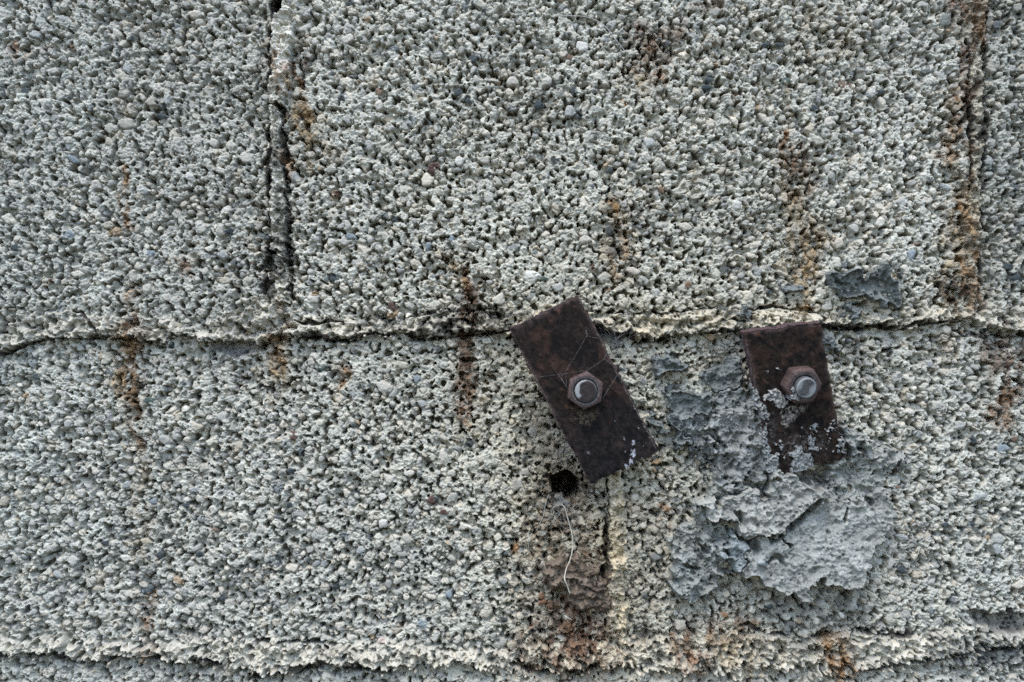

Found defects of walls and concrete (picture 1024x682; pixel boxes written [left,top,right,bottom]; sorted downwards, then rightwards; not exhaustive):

crack [258,0,510,347]
corrosion [942,206,976,302]
corrosion [457,268,477,424]
corrosion [564,606,591,654]